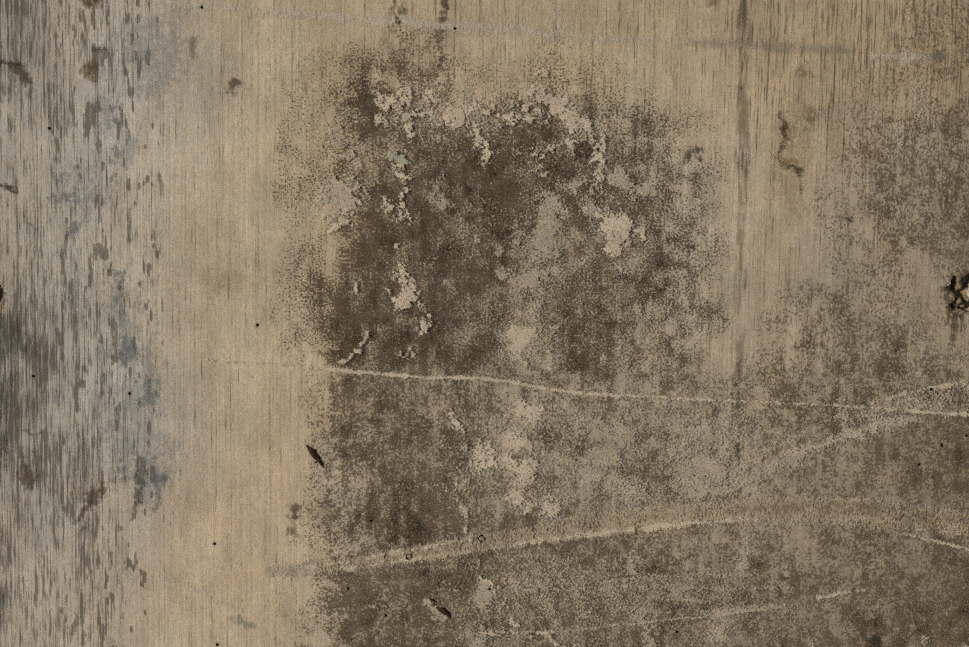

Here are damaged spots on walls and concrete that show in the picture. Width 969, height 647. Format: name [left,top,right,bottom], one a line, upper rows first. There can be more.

water stain [249,0,969,647]